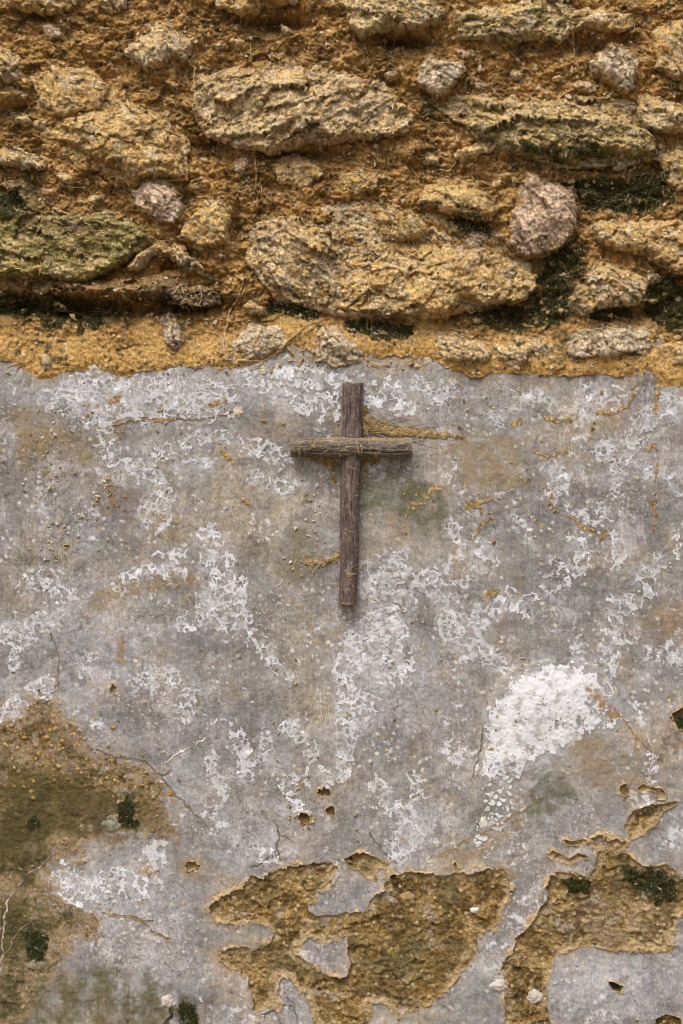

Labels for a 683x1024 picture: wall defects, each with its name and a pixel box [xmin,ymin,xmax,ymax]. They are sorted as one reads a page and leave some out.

spalling [202,523,683,1024]